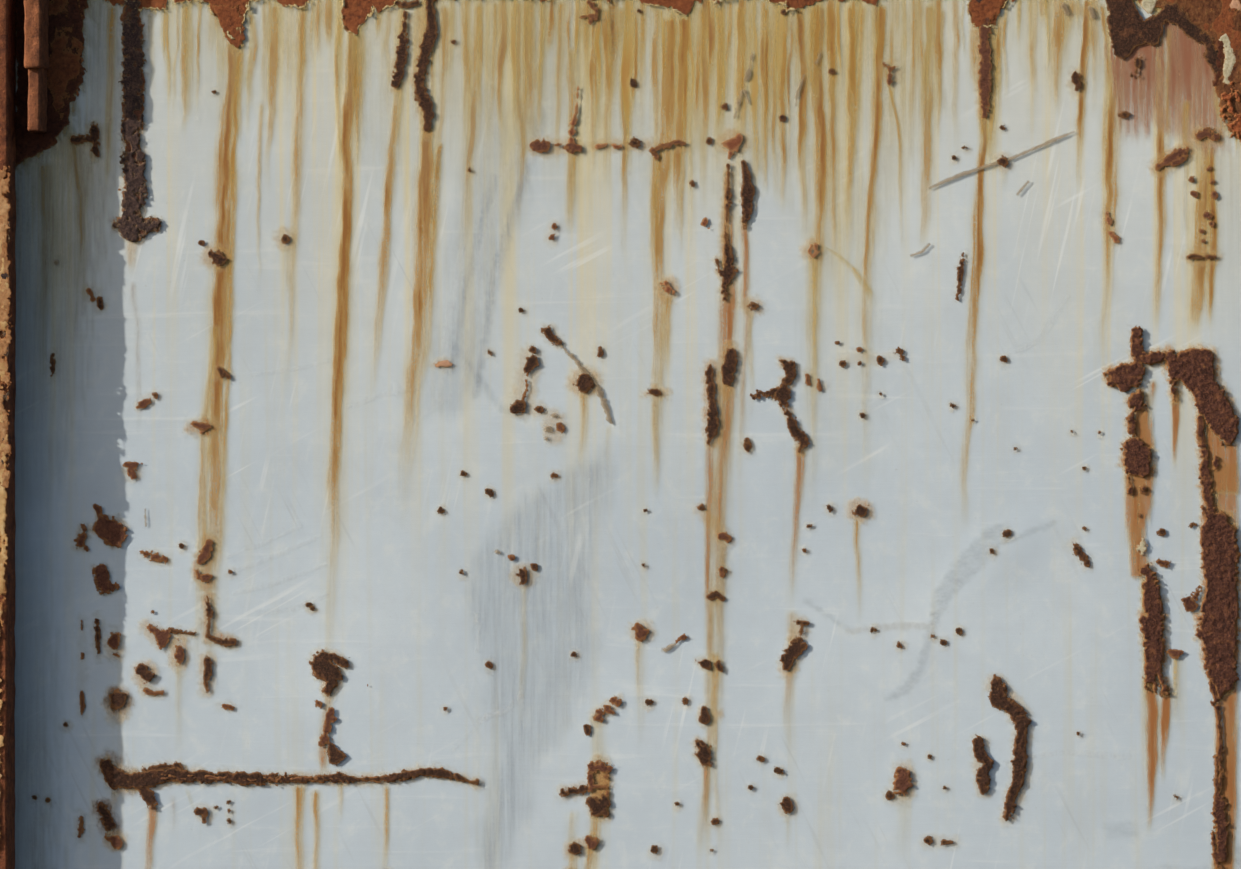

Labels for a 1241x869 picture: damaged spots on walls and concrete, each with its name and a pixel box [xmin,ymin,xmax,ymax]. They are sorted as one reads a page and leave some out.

rust [912,0,1020,429]
rust [86,288,104,310]
rust [104,0,906,725]
rust [74,504,128,552]
rust [92,563,120,595]
rust [1102,325,1241,869]
rust [309,649,350,766]
rust [559,759,615,869]
rust [694,739,713,798]
rust [972,735,994,795]
rust [988,674,1032,821]